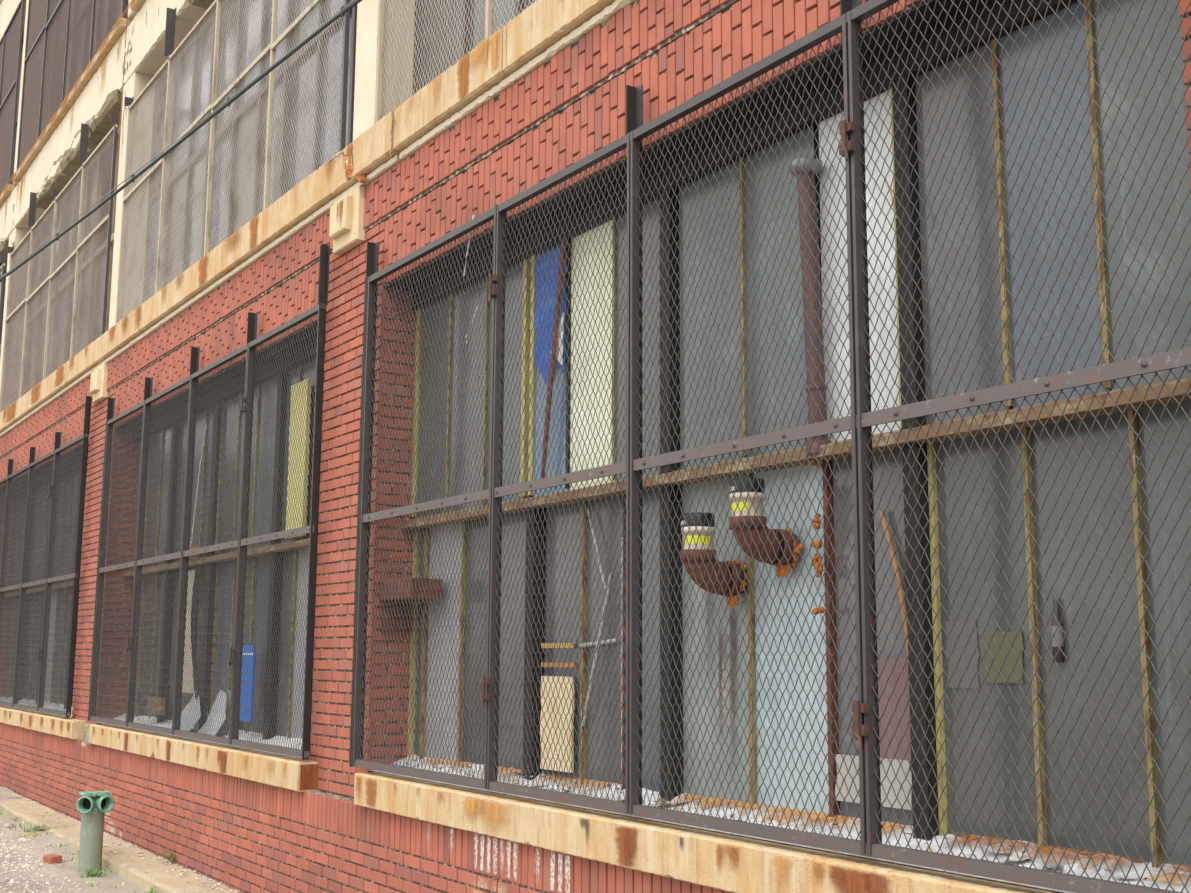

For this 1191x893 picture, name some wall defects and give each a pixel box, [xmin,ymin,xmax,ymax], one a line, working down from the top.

rust [458,32,498,97]
rust [228,216,258,249]
rust [198,255,207,285]
rust [157,739,226,773]
rust [300,764,318,790]
rust [357,777,376,805]
rust [678,794,854,824]
damp [474,834,518,893]
damp [535,849,571,893]
rust [616,827,636,866]
rust [814,864,888,893]
rust [955,833,1129,867]